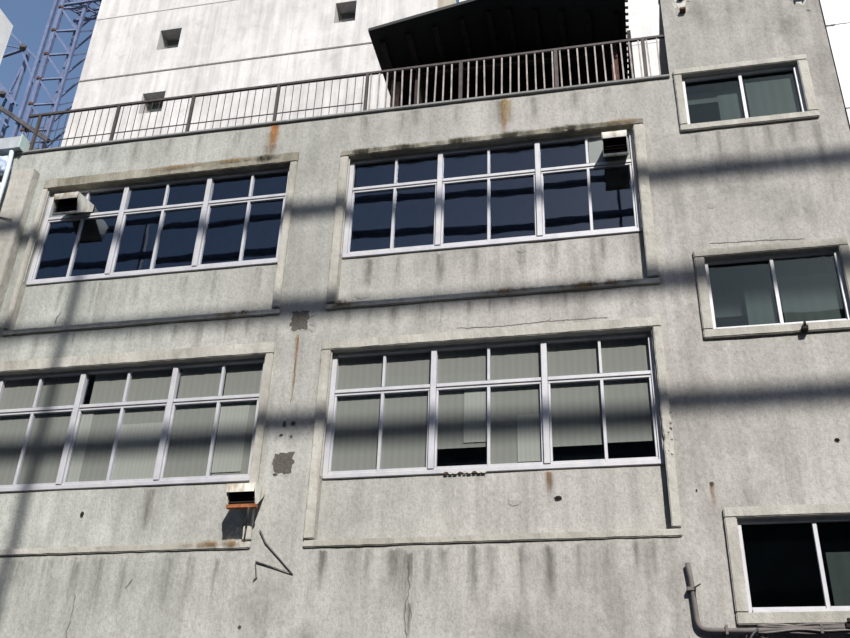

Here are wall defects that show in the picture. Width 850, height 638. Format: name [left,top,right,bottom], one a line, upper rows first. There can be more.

spalling [288,309,311,334]
spalling [271,450,297,477]
crack [404,559,412,638]